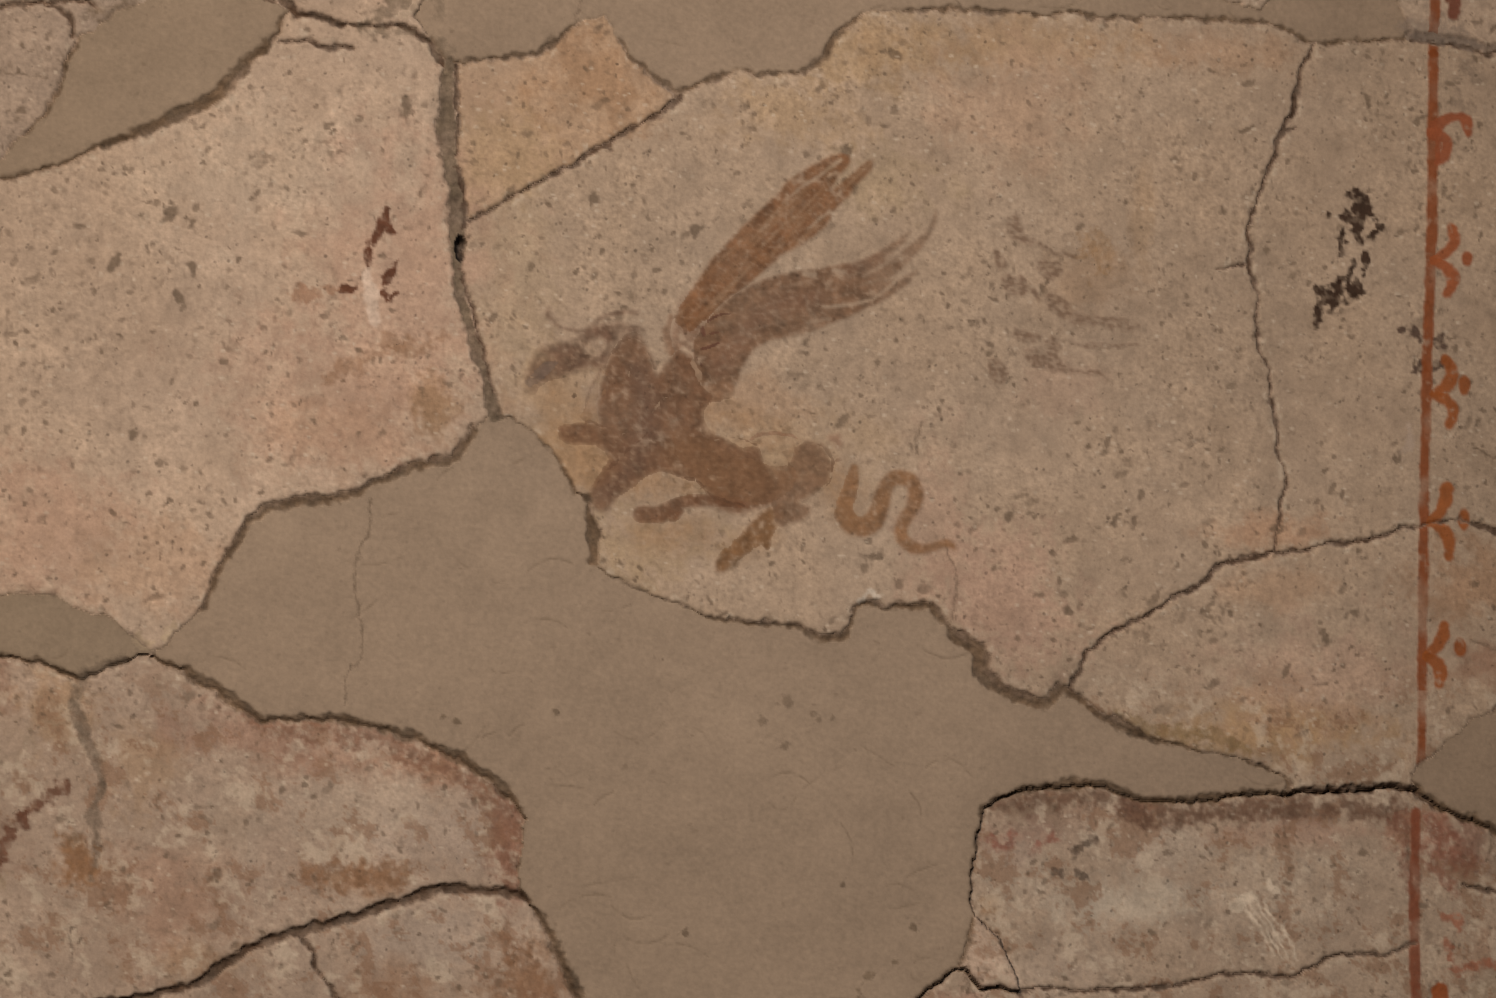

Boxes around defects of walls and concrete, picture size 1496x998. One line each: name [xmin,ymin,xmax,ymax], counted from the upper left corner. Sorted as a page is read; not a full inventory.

crack [0,0,92,41]
crack [1407,38,1496,60]
crack [263,0,684,423]
damp [1309,184,1389,331]
crack [1068,42,1496,693]
crack [342,497,373,706]
peeling [855,586,883,605]
crack [65,653,131,882]
crack [1280,783,1438,812]
crack [132,884,533,998]
crack [957,916,1409,998]
crack [1462,883,1496,895]